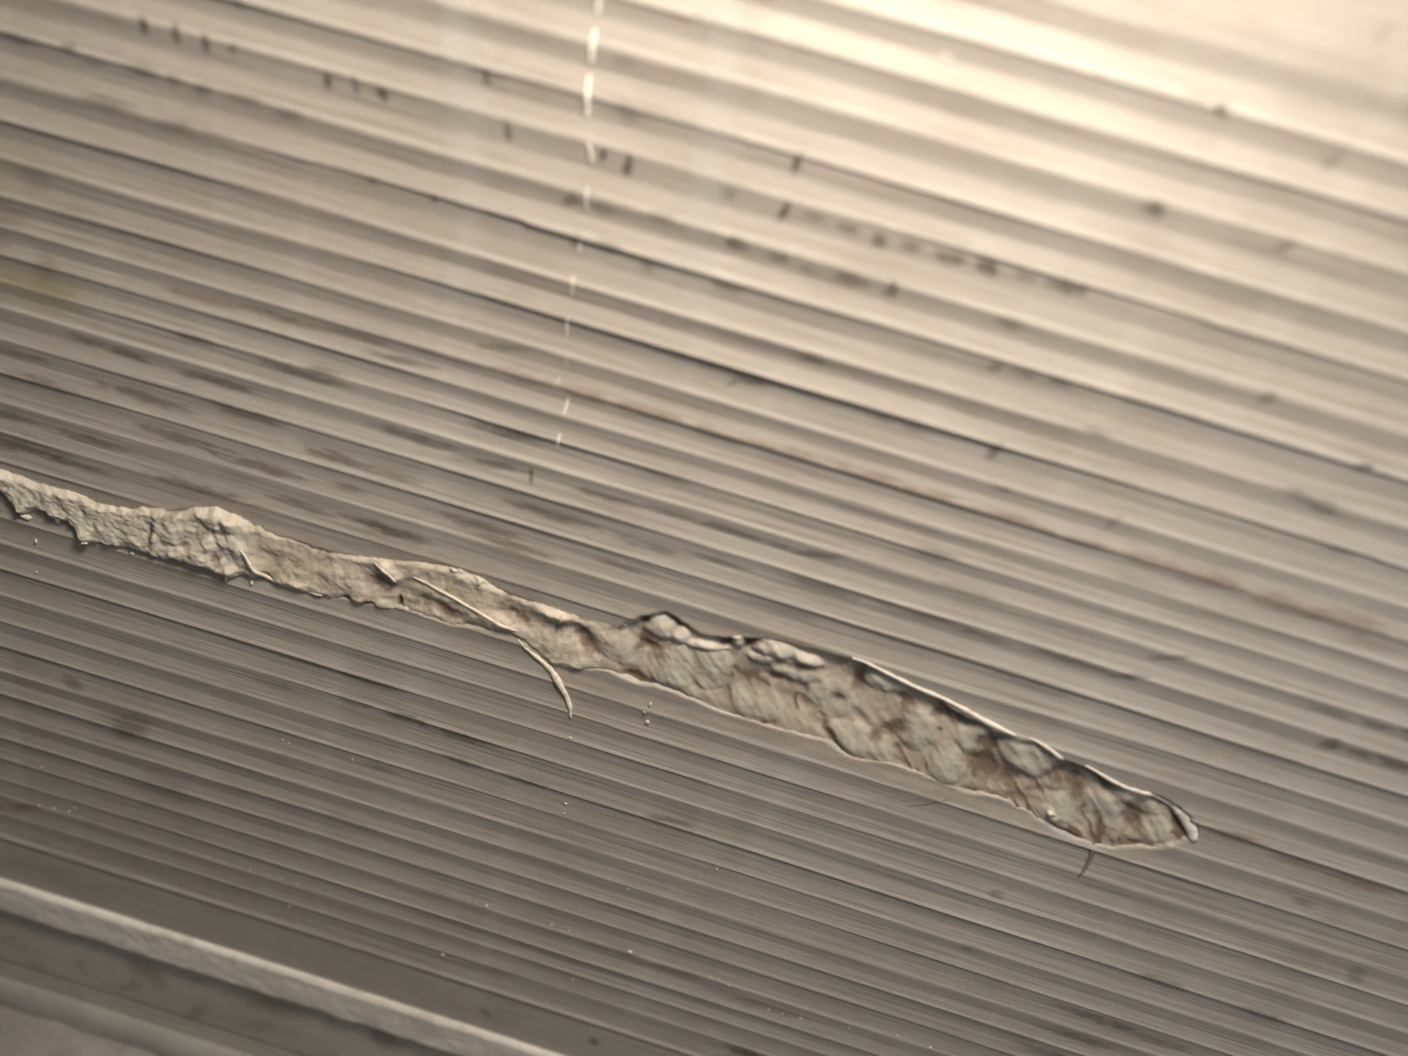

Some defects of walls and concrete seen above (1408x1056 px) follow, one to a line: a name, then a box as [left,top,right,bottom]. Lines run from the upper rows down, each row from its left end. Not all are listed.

spalling [0,468,1198,877]